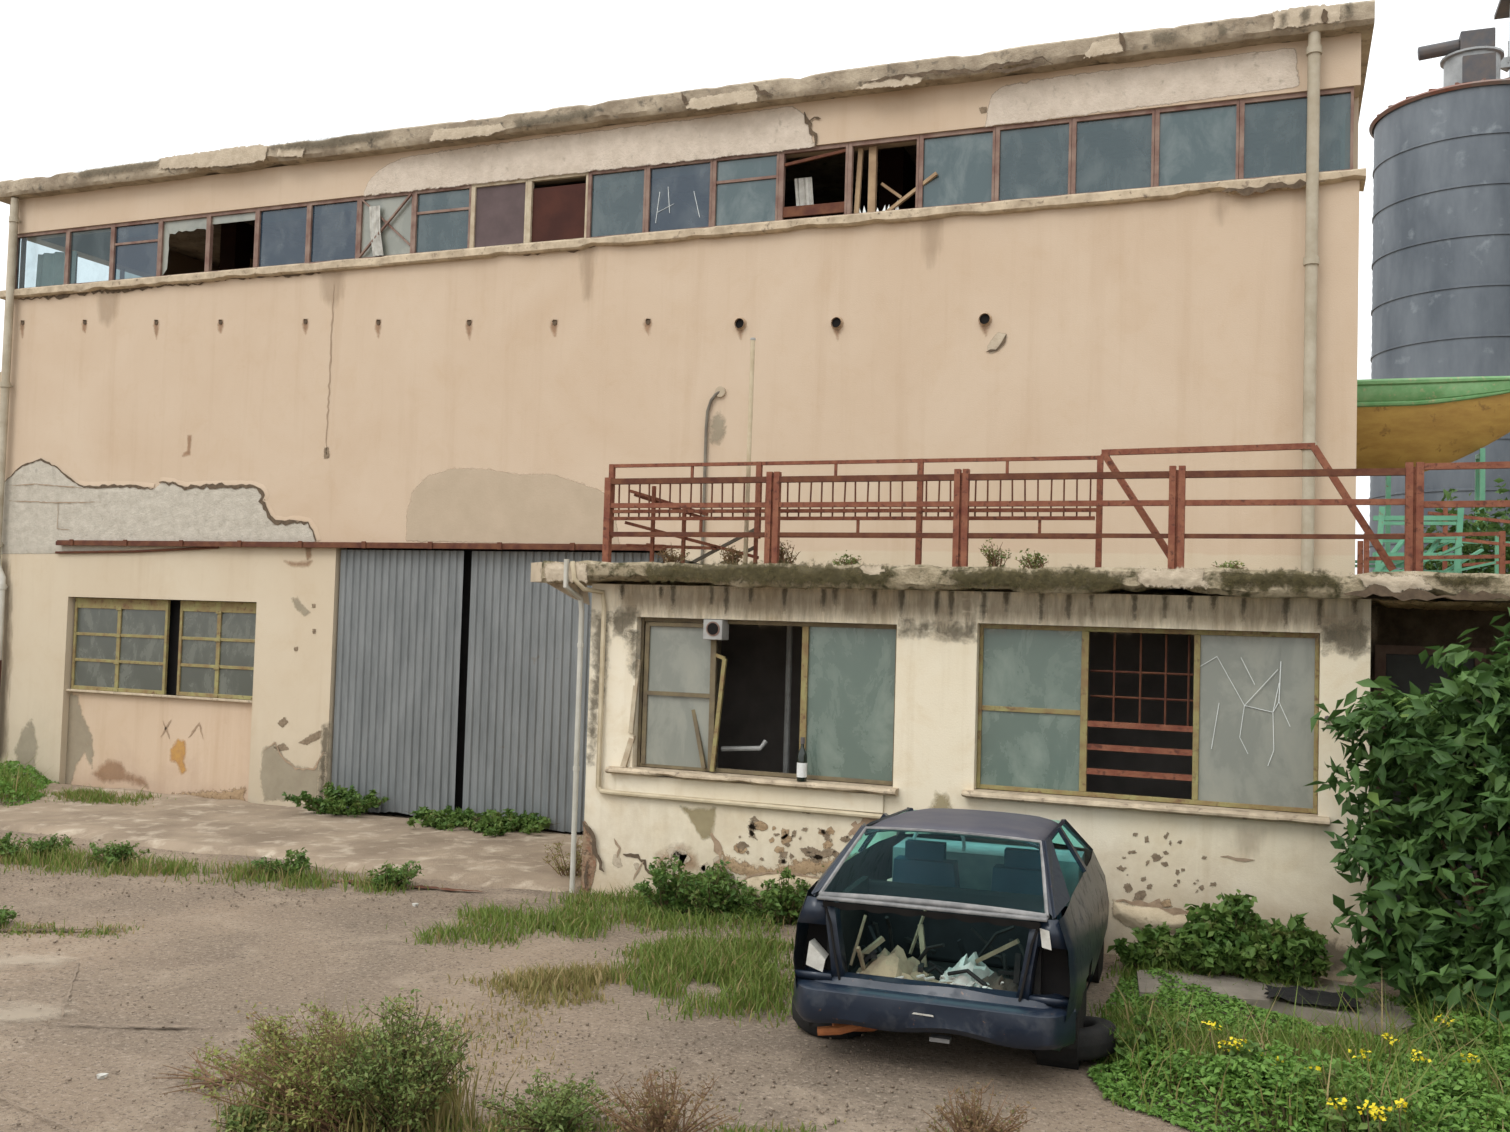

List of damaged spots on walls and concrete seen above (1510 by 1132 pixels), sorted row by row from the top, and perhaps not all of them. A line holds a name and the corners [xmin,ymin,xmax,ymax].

flaking render [1,458,321,554]
damp [902,592,986,640]
damp [1318,600,1367,654]
damp [160,720,203,773]
flaking render [173,717,324,801]
spalling [581,821,639,893]
spalling [658,812,858,877]
peeling [1117,833,1216,901]